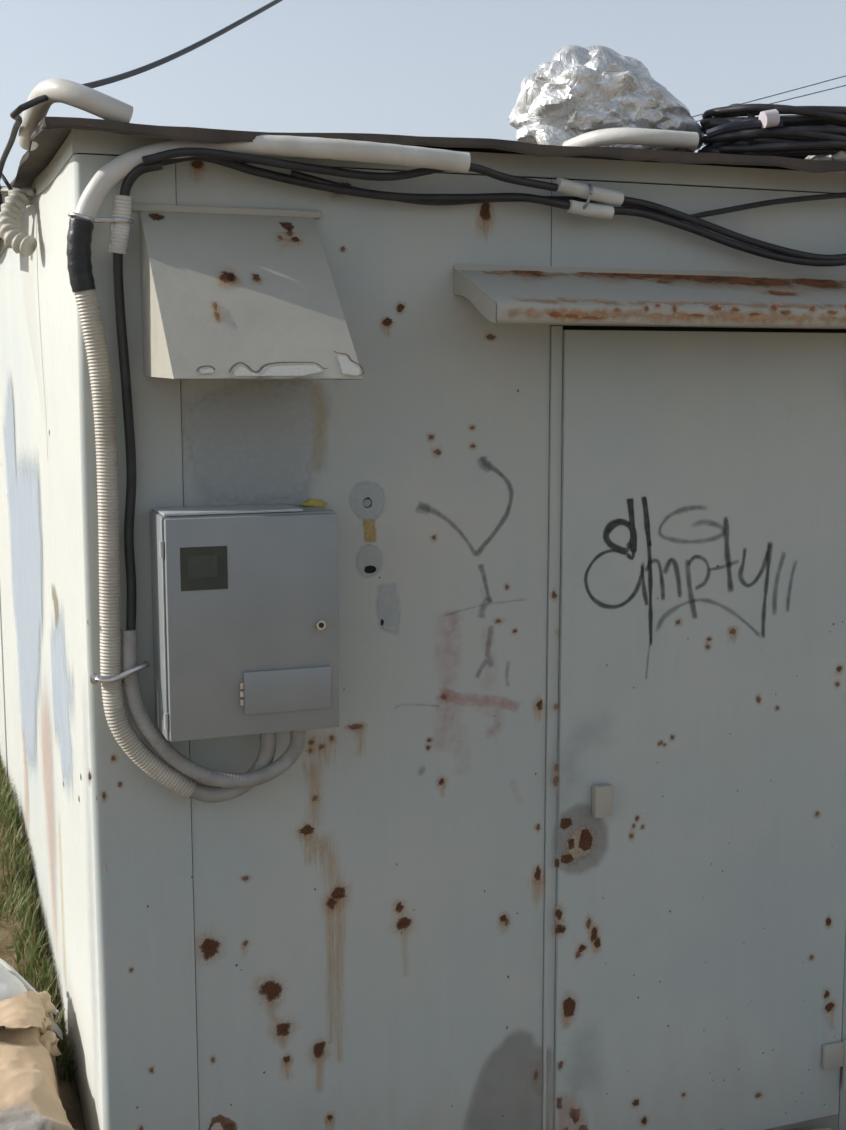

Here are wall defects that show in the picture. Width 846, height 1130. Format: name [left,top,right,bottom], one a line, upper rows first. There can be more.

corrosion [220,271,235,283]
corrosion [484,270,846,323]
peeling [229,351,364,376]
corrosion [554,818,593,868]
corrosion [326,888,345,909]
corrosion [396,902,411,934]
corrosion [555,909,565,933]
corrosion [576,919,600,957]
corrosion [259,981,282,1001]
corrosion [276,1023,290,1036]
corrosion [314,1041,326,1057]
corrosion [208,1104,237,1130]